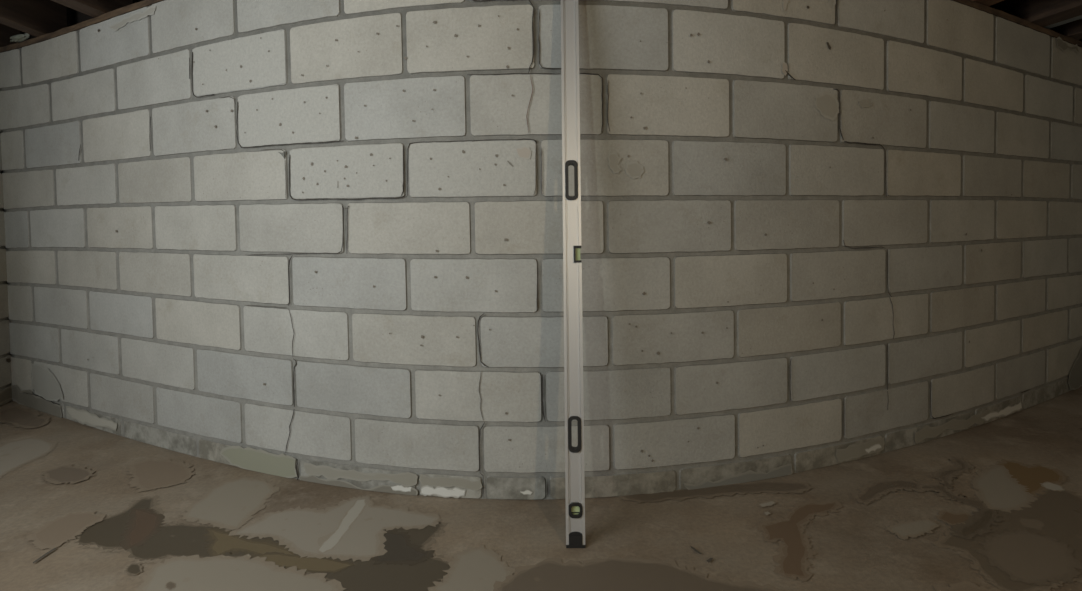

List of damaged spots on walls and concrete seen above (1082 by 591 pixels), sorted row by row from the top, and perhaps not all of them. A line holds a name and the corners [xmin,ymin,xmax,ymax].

crack [189,0,610,253]
crack [833,88,887,196]
crack [245,253,305,480]
crack [477,313,489,494]
crack [539,374,547,420]
damp [75,446,813,591]
damp [851,457,1082,591]